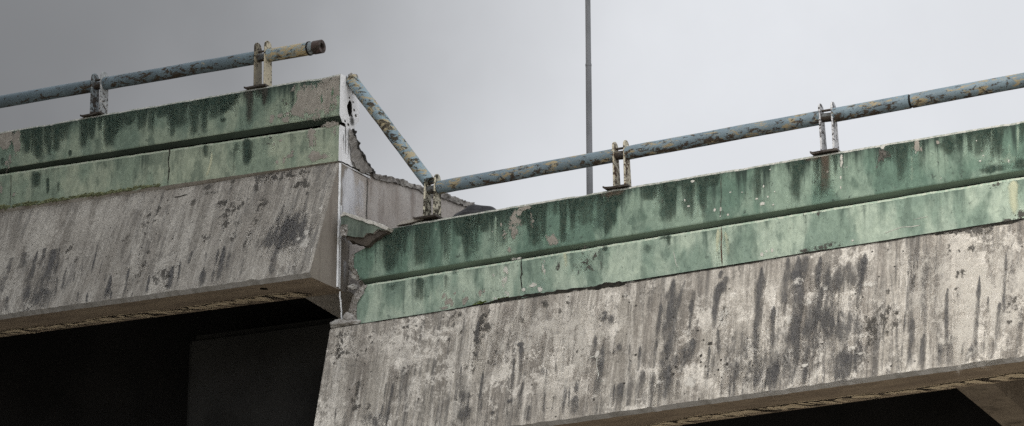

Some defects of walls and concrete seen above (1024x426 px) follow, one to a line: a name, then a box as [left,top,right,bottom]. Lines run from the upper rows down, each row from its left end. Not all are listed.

damp [21,88,268,158]
peeling [269,76,475,206]
damp [940,126,1003,153]
damp [122,169,314,296]
spalling [348,251,406,325]
peeling [430,206,534,313]
damp [383,190,622,273]
peeling [522,261,570,313]
damp [642,174,719,219]
crack [373,203,1023,323]
damp [446,225,1024,418]
damp [646,373,1024,426]